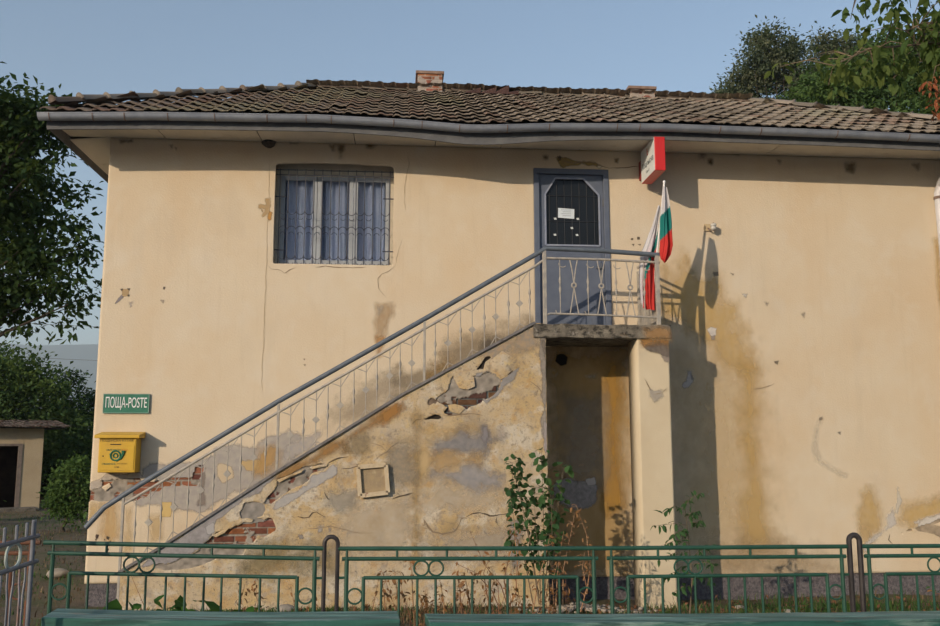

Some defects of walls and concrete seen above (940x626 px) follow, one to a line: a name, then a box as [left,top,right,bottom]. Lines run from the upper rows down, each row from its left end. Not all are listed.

spalling [641,338,670,363]
leakage [663,269,755,392]
spalling [428,356,518,415]
leakage [546,347,632,576]
peeling [90,430,337,570]
leakage [860,491,940,551]
spalling [907,518,940,537]